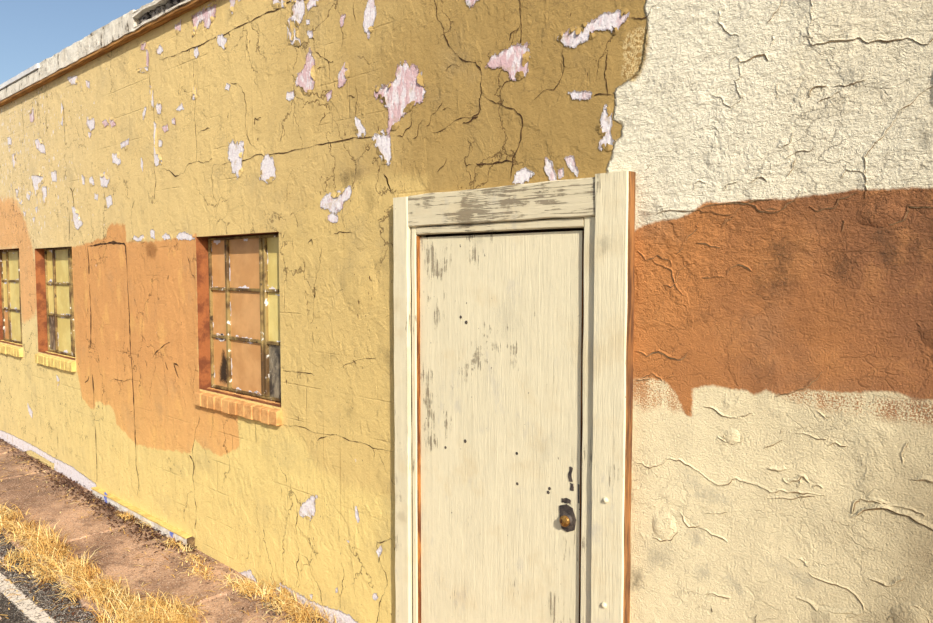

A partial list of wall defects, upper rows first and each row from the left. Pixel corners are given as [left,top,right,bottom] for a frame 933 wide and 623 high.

spalling [132,0,217,37]
peeling [271,0,319,101]
crack [154,0,565,202]
peeling [354,60,426,165]
peeling [485,42,531,81]
peeling [557,7,630,48]
crack [594,53,612,97]
peeling [512,155,579,185]
crack [69,188,179,494]
peeling [0,430,96,492]
crack [285,425,392,455]
crack [296,507,355,607]